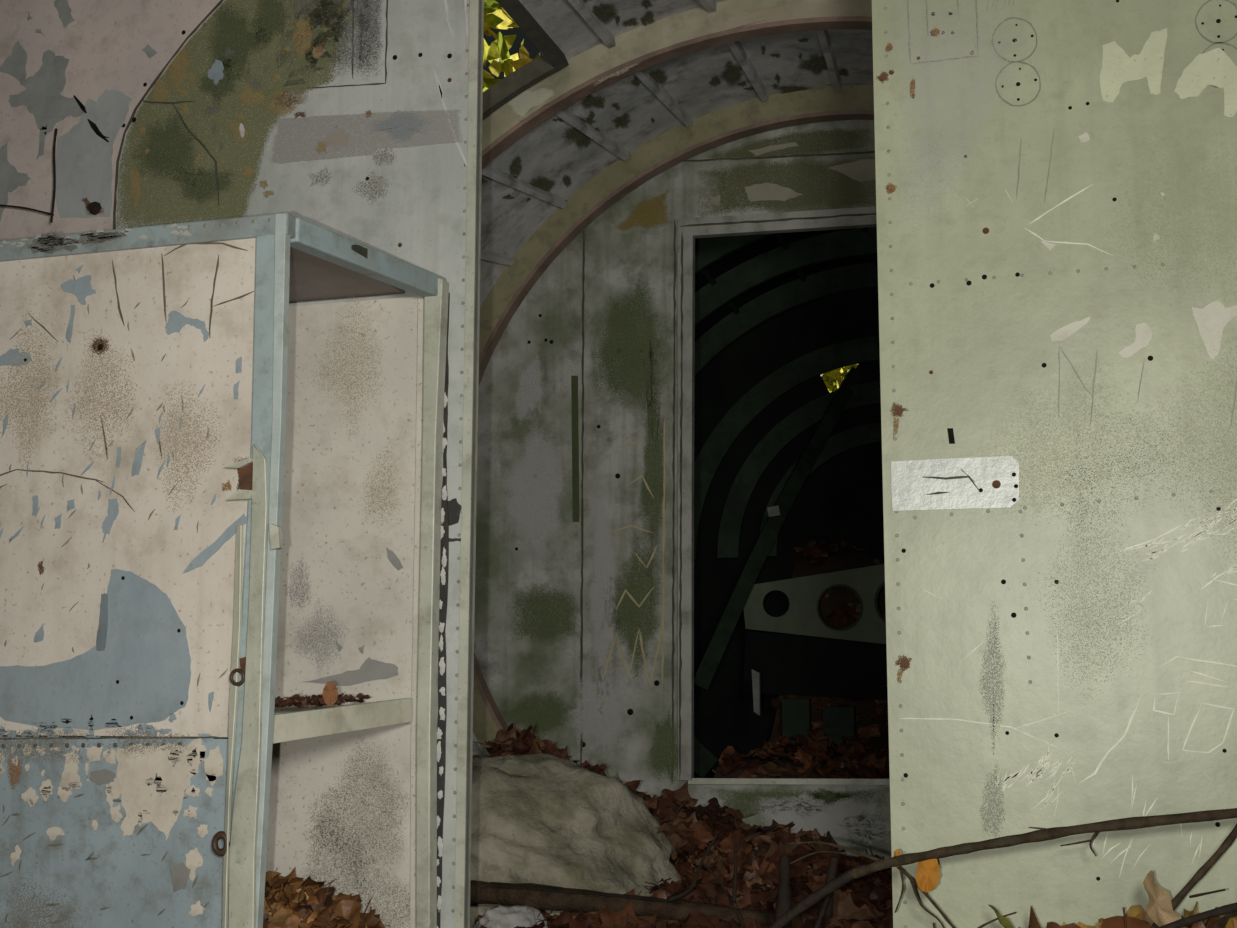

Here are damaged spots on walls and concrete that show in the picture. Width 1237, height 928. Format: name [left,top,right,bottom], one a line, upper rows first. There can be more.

water stain [272,0,384,106]
peeling [1100,28,1237,117]
peeling [0,41,148,254]
water stain [613,189,672,231]
water stain [696,127,876,217]
peeling [61,264,96,343]
peeling [165,311,209,342]
peeling [1192,301,1237,361]
peeling [102,499,119,534]
peeling [183,514,247,573]
peeling [0,569,223,892]
rust [7,757,22,789]